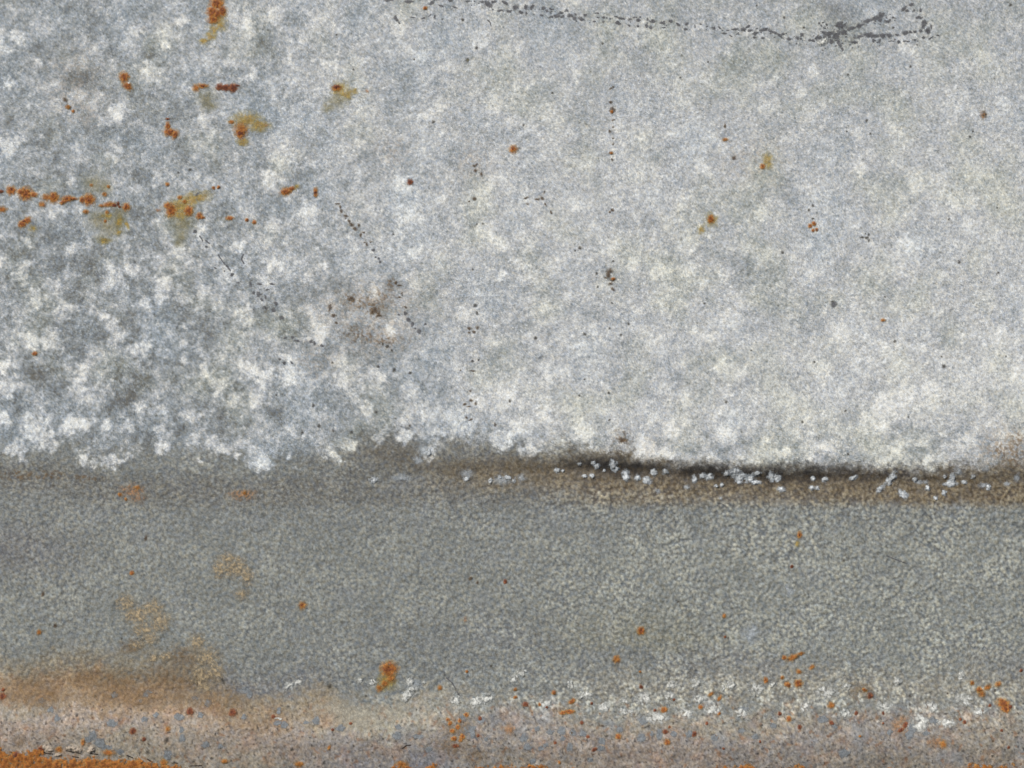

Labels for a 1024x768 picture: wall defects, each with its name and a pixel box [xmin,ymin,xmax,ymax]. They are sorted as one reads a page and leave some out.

rust [200,0,226,43]
rust [193,83,239,107]
rust [229,115,266,146]
rust [0,180,130,243]
rust [157,185,220,238]
rust [358,661,426,715]
rust [446,694,493,748]
rust [510,667,736,752]
rust [748,652,815,696]
rust [778,683,893,729]
rust [897,671,1012,732]
rust [0,746,181,768]